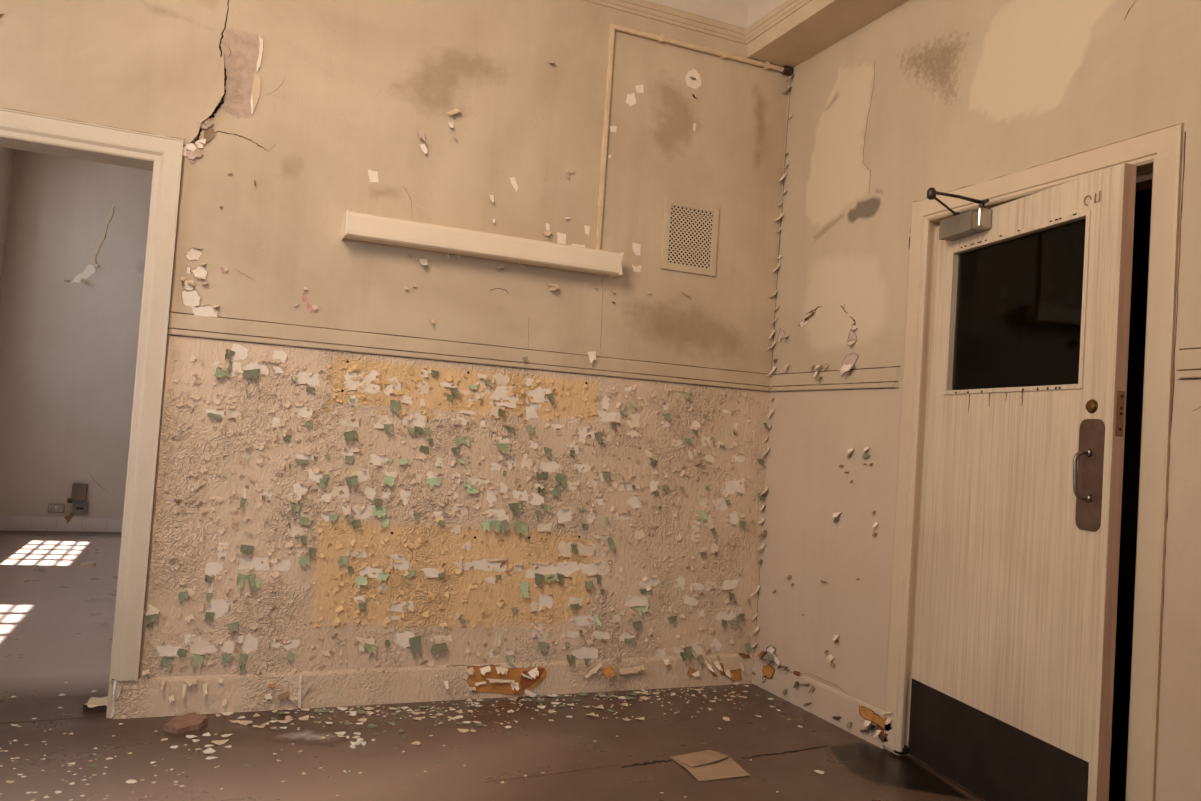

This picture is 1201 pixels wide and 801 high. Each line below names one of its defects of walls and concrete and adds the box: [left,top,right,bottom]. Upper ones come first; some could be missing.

spalling [221,28,263,119]
damp [371,32,523,135]
damp [811,17,980,245]
crack [4,0,901,678]
peeling [808,305,859,381]
peeling [142,74,822,745]
peeling [832,706,892,742]